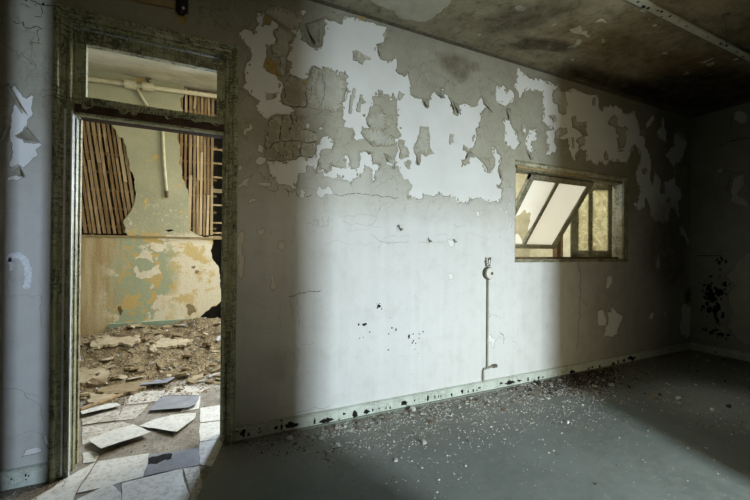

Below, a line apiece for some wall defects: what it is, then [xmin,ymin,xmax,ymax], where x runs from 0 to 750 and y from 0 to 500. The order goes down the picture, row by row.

peeling [367,0,454,24]
peeling [1,83,44,182]
peeling [236,5,688,225]
peeling [133,235,184,279]
damp [700,256,730,339]
peeling [597,304,624,339]
peeling [313,406,391,425]